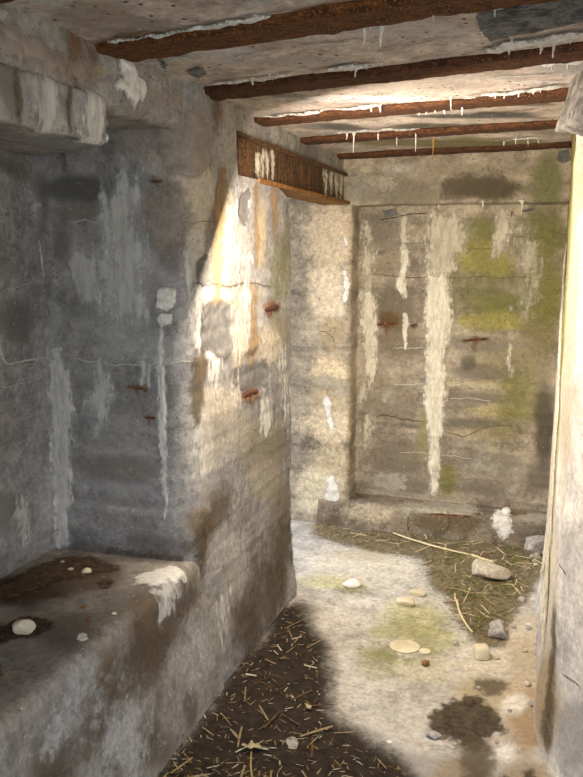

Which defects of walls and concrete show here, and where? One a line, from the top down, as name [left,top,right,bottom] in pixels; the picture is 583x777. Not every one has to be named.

crack [0,344,47,365]
leakage [45,156,223,549]
crack [75,355,208,366]
rust [210,167,228,306]
crack [192,280,271,288]
rust [242,389,259,401]
rust [247,284,279,366]
leakage [402,206,476,517]
leakage [443,175,545,323]
leakage [491,509,513,539]
leakage [539,244,567,744]
leakage [427,679,505,777]